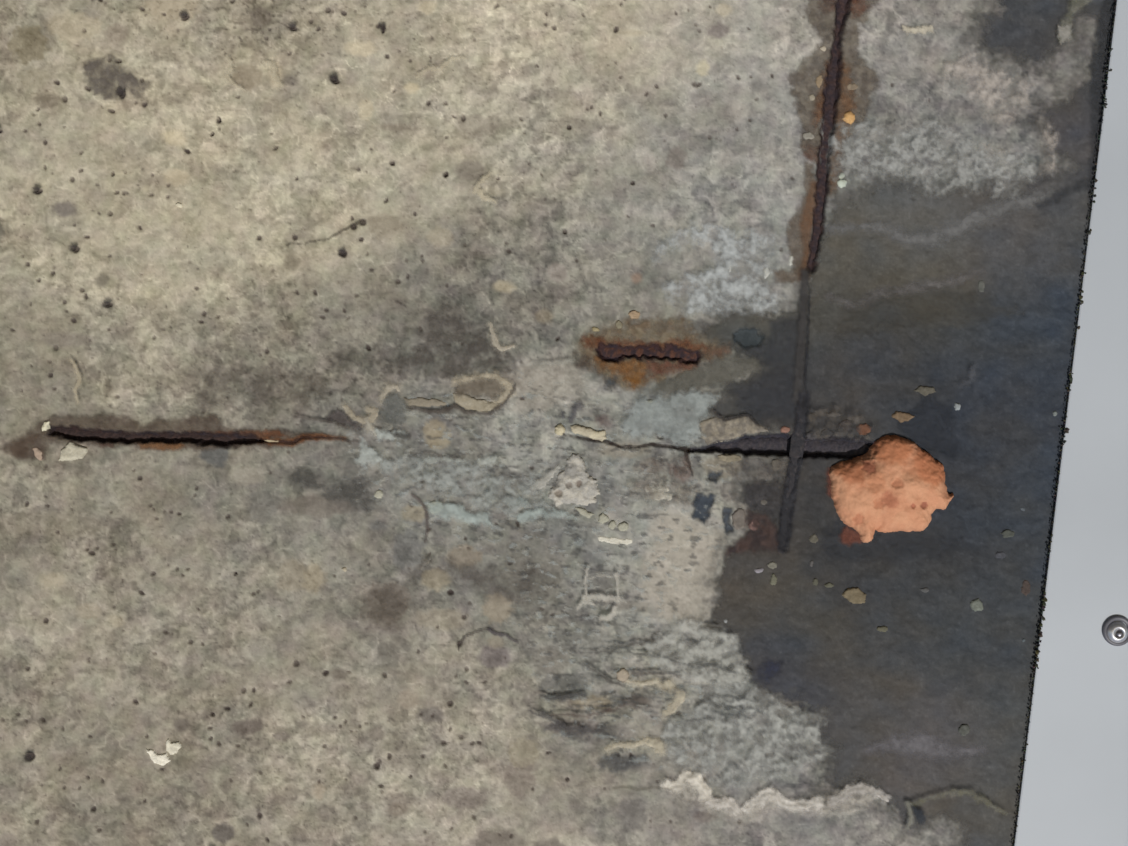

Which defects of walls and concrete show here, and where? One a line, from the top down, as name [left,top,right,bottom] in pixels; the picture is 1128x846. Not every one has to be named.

corrosion [775,0,878,283]
spalling [596,342,702,364]
corrosion [576,318,759,392]
corrosion [3,415,334,459]
water stain [555,402,607,441]
water stain [622,0,1117,846]